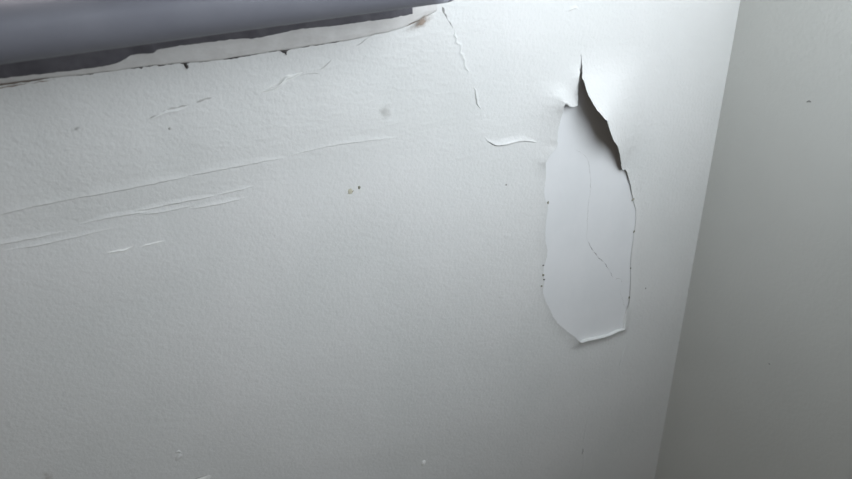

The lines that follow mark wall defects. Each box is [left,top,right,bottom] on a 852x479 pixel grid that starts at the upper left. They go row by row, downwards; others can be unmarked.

crack [0,78,54,89]
peeling [465,45,698,399]